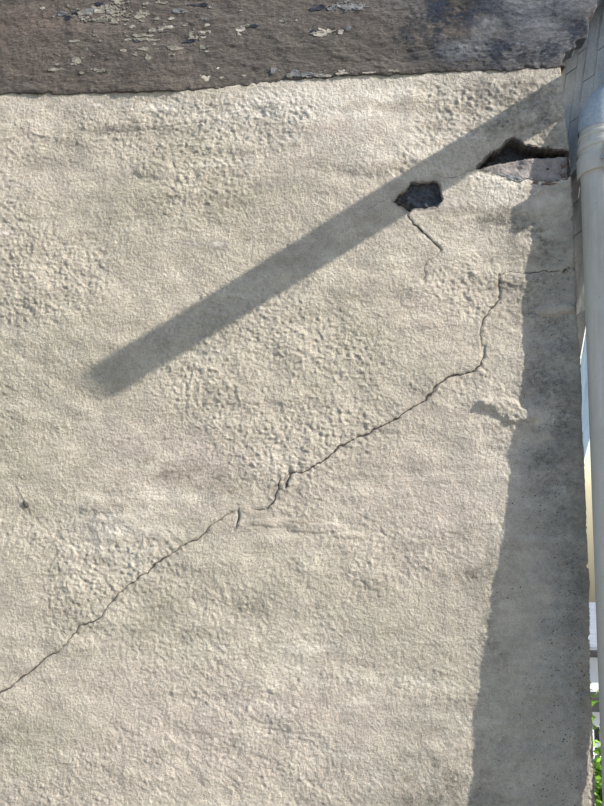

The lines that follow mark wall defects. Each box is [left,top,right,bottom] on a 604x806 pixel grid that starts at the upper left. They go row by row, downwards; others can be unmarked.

peeling [48,49,109,75]
peeling [52,0,213,61]
peeling [235,24,259,36]
peeling [309,26,351,37]
peeling [286,70,376,78]
water stain [401,0,587,67]
spalling [391,179,468,213]
spalling [476,136,569,198]
crack [408,213,440,313]
crack [0,270,558,693]
water stain [510,332,589,805]